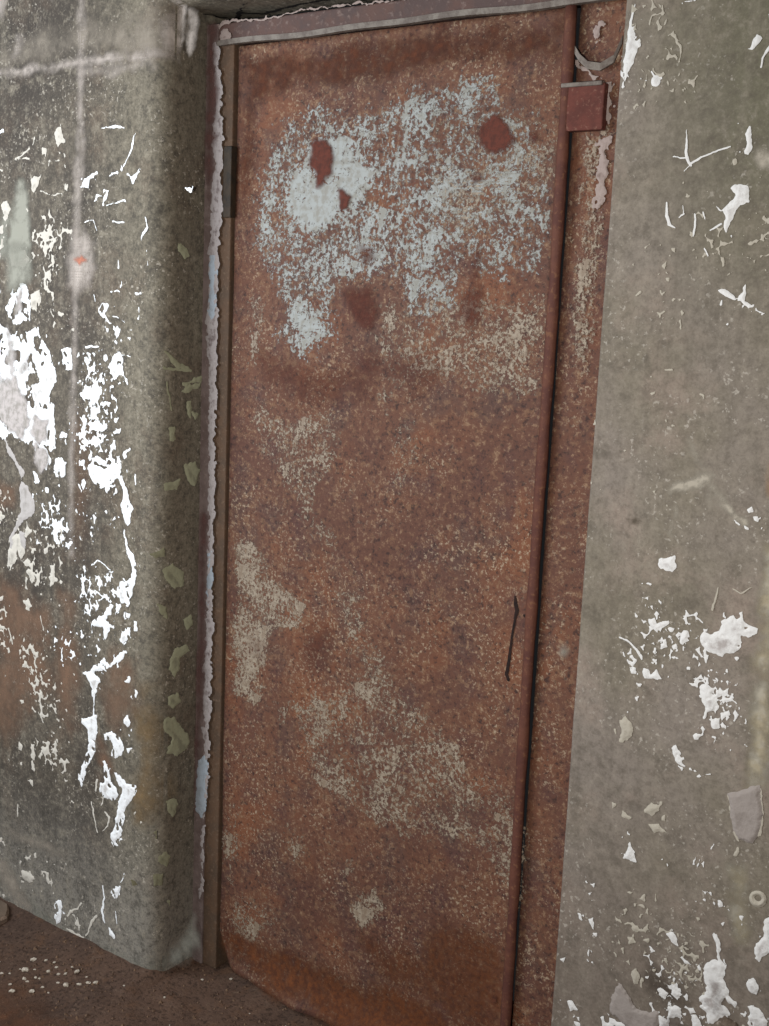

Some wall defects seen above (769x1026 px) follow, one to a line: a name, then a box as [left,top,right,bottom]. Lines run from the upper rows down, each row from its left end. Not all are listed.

peeling [15,124,66,168]
peeling [31,125,140,206]
corrosion [309,140,333,187]
corrosion [338,189,351,211]
corrosion [479,114,514,153]
peeling [690,184,769,276]
peeling [246,65,557,499]
peeling [718,284,765,315]
peeling [163,0,392,899]
peeling [0,210,142,847]
peeling [619,583,758,742]
peeling [20,853,137,939]